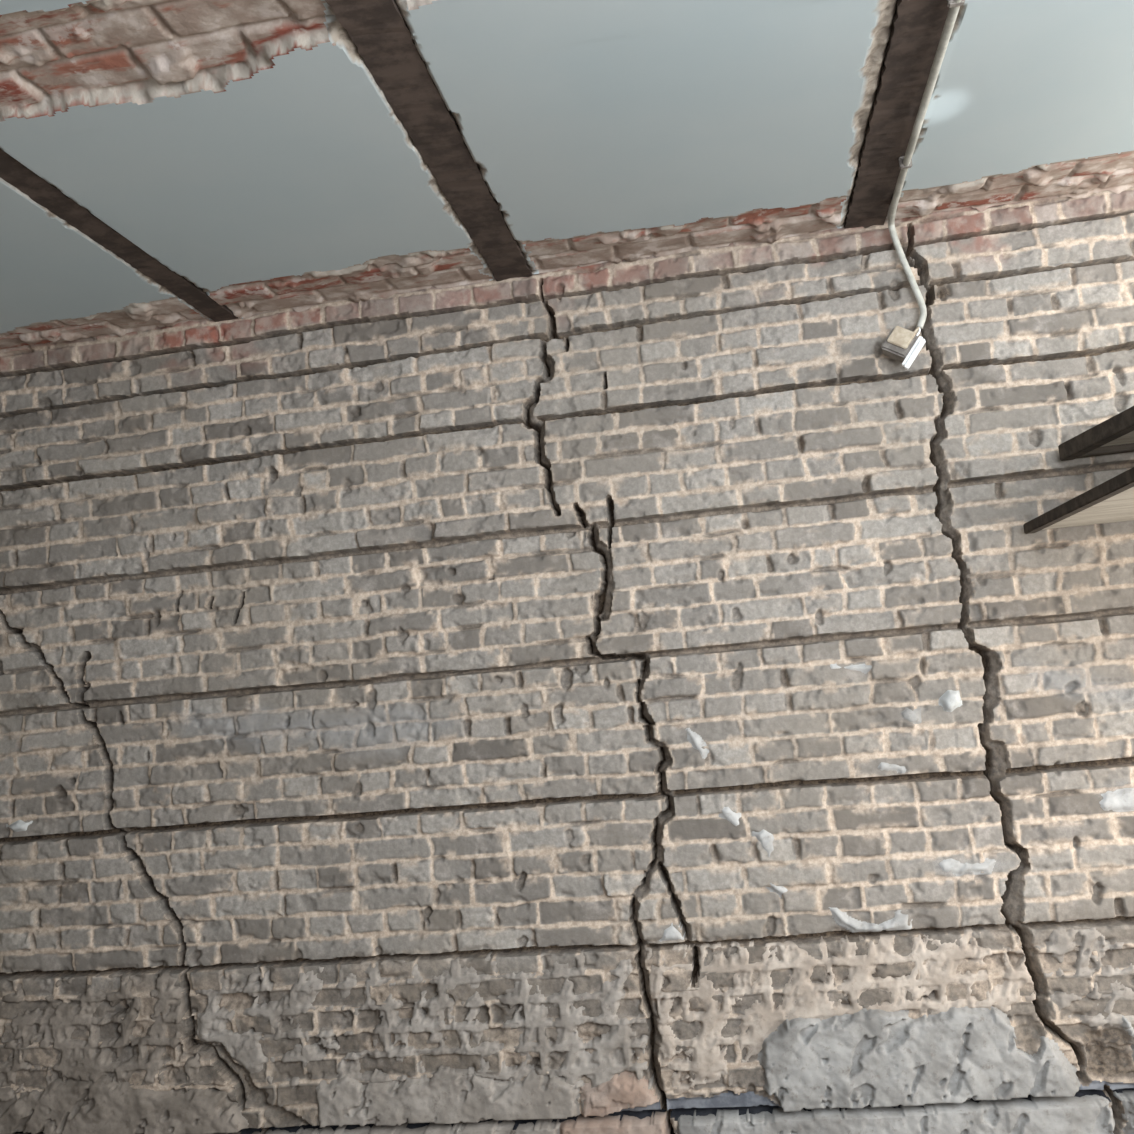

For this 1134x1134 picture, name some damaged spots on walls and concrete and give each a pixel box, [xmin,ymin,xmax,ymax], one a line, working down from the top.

spalling [321,0,494,281]
spalling [394,0,539,274]
crack [0,590,269,1134]
crack [521,278,700,1133]
crack [903,223,1128,1134]